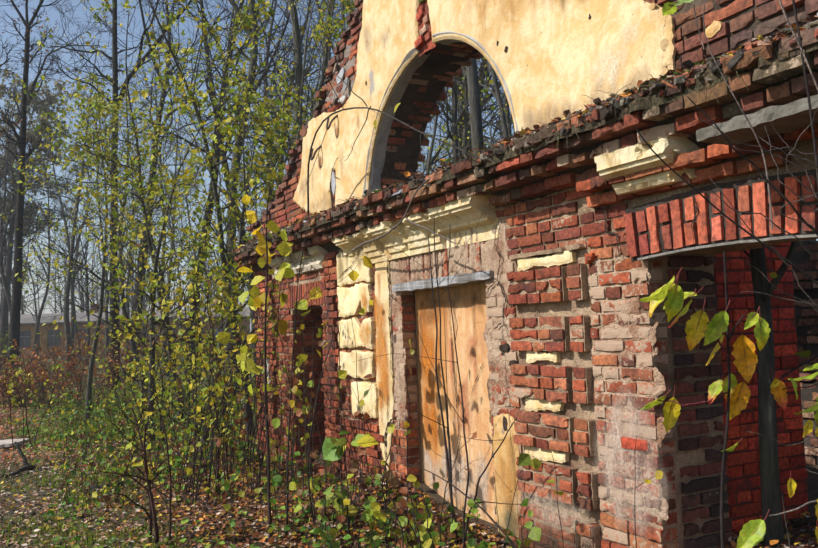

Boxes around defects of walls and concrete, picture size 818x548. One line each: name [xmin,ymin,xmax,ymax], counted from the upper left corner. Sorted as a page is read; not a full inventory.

peeling [632,0,676,75]
spalling [325,39,357,108]
spalling [585,253,597,264]
spalling [499,343,519,370]
spalling [621,437,650,451]